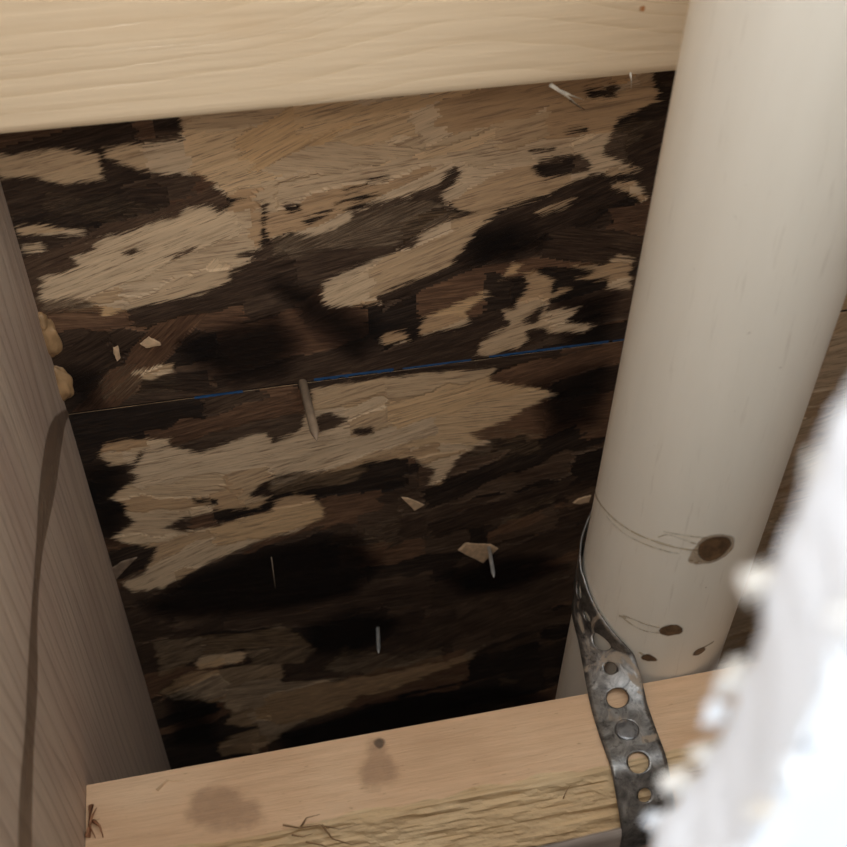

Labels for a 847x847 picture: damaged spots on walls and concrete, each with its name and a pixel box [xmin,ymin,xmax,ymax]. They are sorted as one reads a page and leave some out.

water stain [0,70,676,847]
water stain [689,535,733,564]
water stain [659,625,683,636]
crack [282,814,367,847]